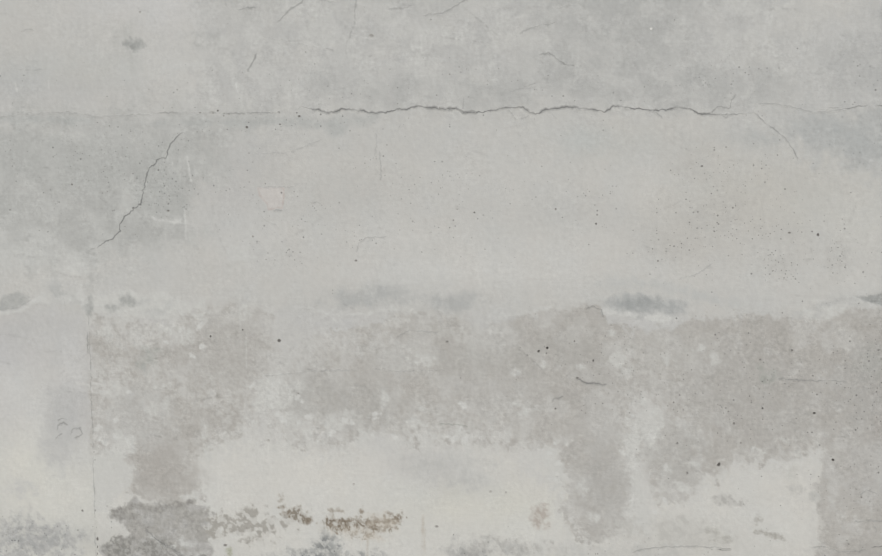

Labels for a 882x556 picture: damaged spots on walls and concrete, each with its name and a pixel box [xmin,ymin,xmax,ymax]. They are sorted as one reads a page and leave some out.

water stain [0,0,882,294]
crack [88,82,882,252]
water stain [313,275,491,321]
peeling [56,290,882,556]
water stain [248,532,403,556]
water stain [429,507,744,556]